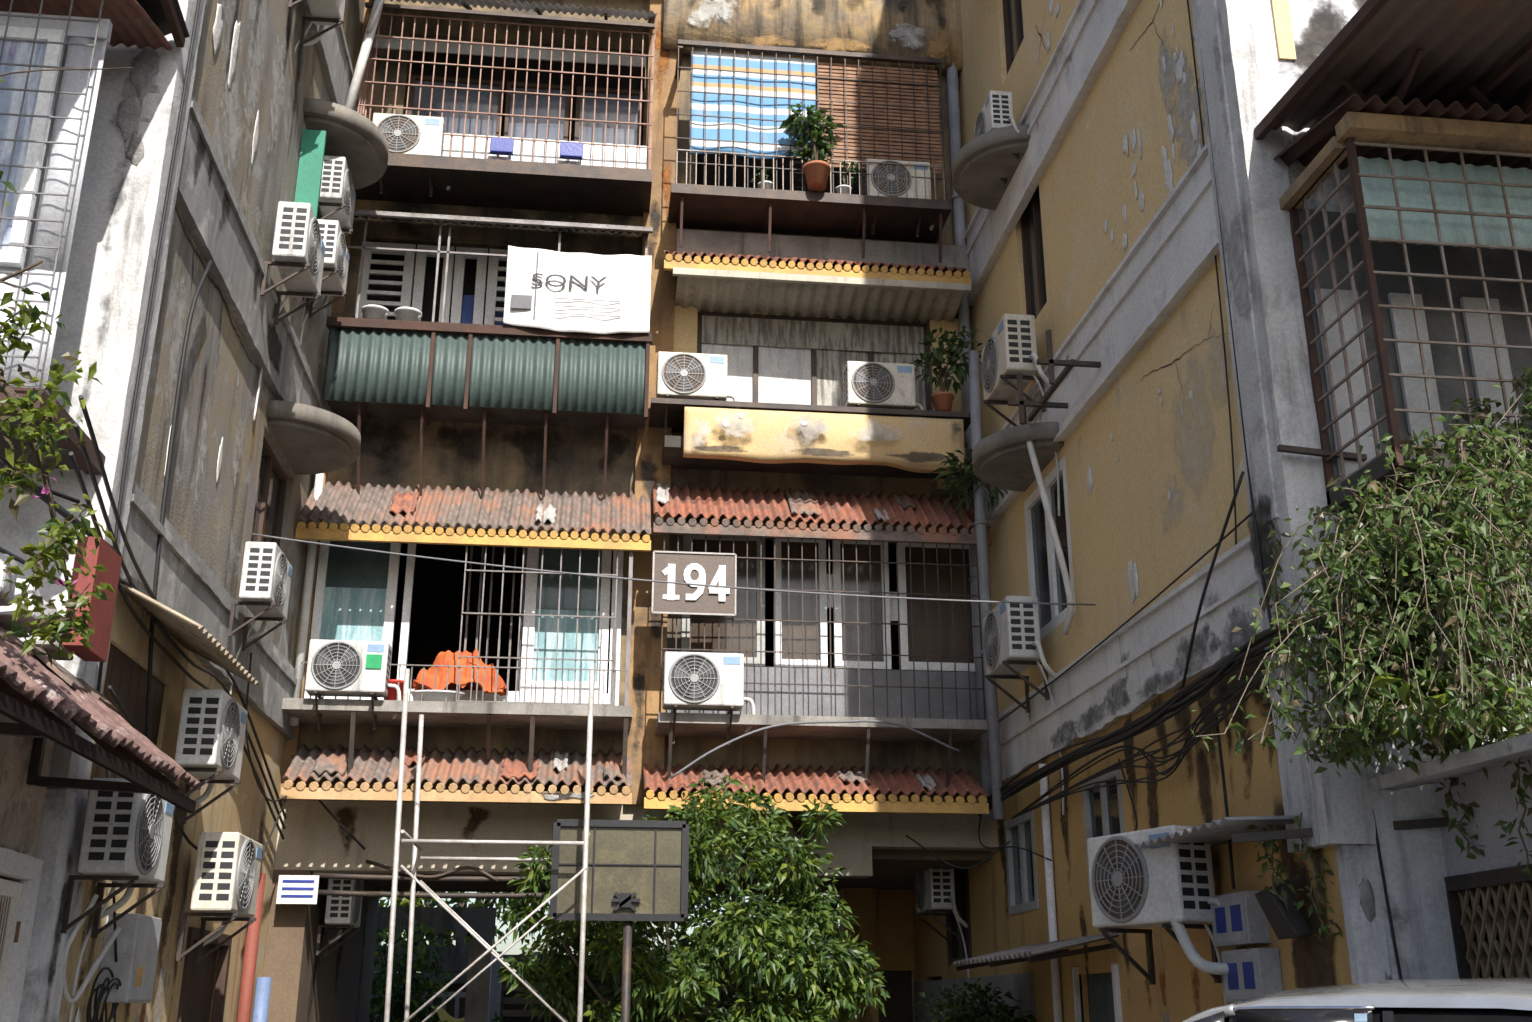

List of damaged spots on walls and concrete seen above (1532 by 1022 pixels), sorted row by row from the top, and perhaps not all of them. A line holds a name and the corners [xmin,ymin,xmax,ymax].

peeling [688,0,736,27]
flaking render [888,24,924,48]
mould [1293,0,1367,77]
peeling [1159,25,1204,196]
crack [1140,305,1228,394]
peeling [695,411,755,445]
peeling [792,414,828,440]
peeling [859,420,899,440]
damp [1051,600,1276,828]
damp [1060,765,1069,860]
damp [997,820,1008,912]
damp [1274,803,1335,988]